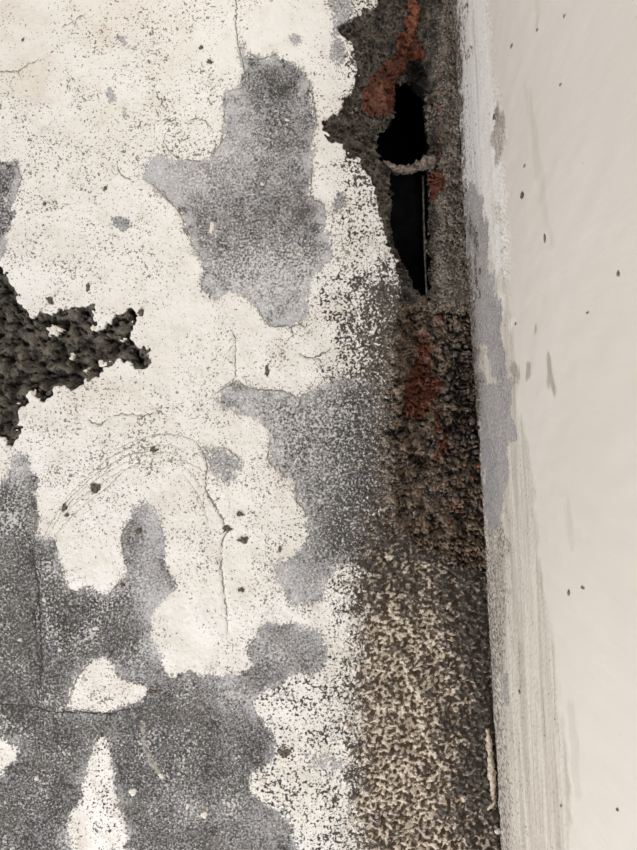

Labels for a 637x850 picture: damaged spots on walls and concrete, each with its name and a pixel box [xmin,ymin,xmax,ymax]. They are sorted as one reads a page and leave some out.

crack [196,441,228,632]
peeling [0,0,488,850]